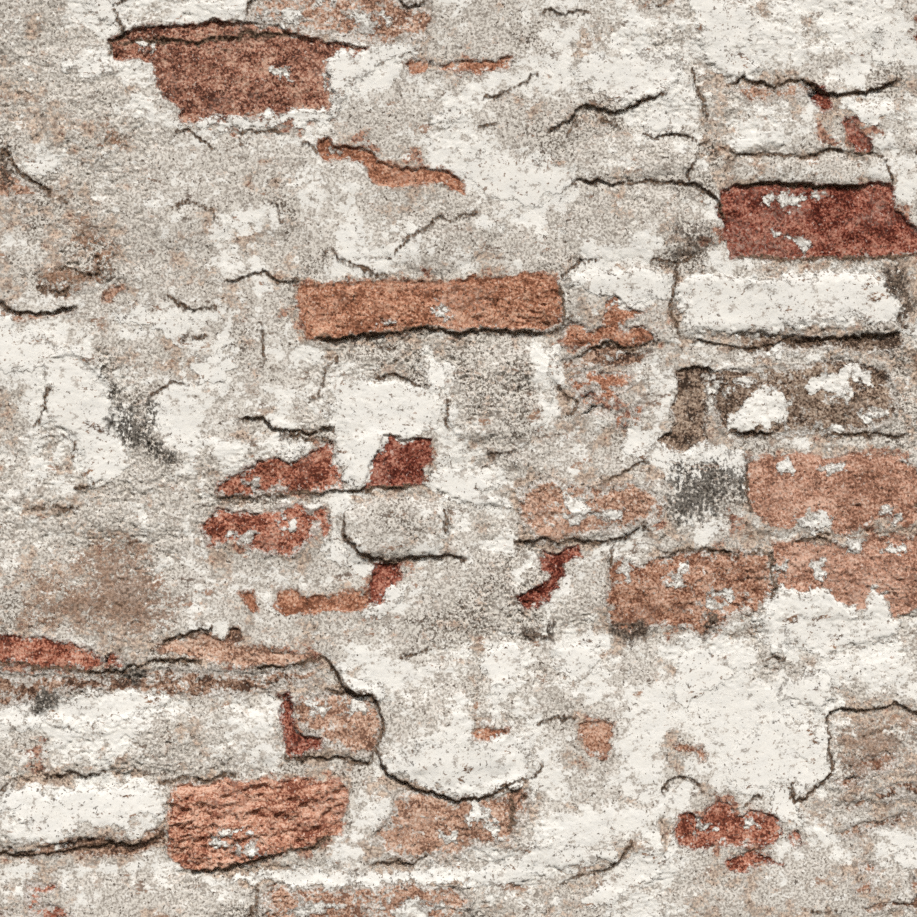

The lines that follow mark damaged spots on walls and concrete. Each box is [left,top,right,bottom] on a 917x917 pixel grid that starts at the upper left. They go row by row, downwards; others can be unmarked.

spalling [61,0,574,209]
crack [546,91,668,137]
crack [571,67,902,221]
crack [0,261,101,316]
peeling [0,305,131,493]
peeling [199,361,667,613]
spalling [295,178,917,874]
spalling [0,625,393,763]
spalling [0,721,671,917]
crack [251,655,544,831]
crack [399,646,429,660]
crack [788,700,917,803]